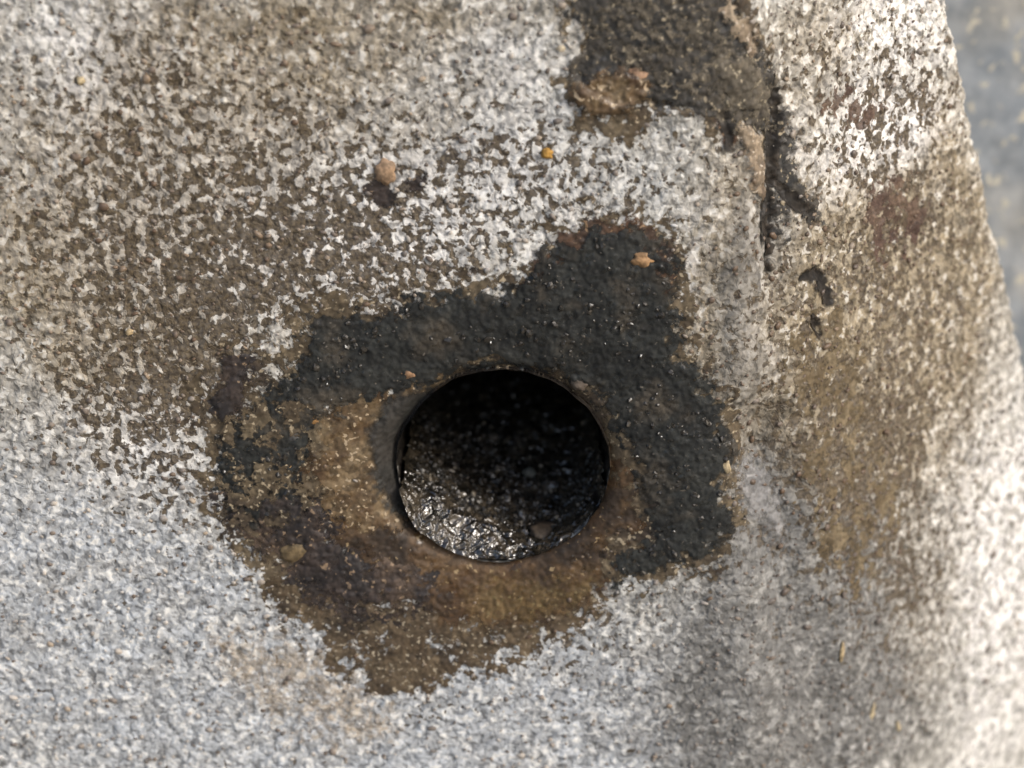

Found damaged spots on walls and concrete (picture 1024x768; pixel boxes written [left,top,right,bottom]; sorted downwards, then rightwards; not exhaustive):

leakage [548,0,790,161]
crack [718,87,825,272]
leakage [198,194,760,619]